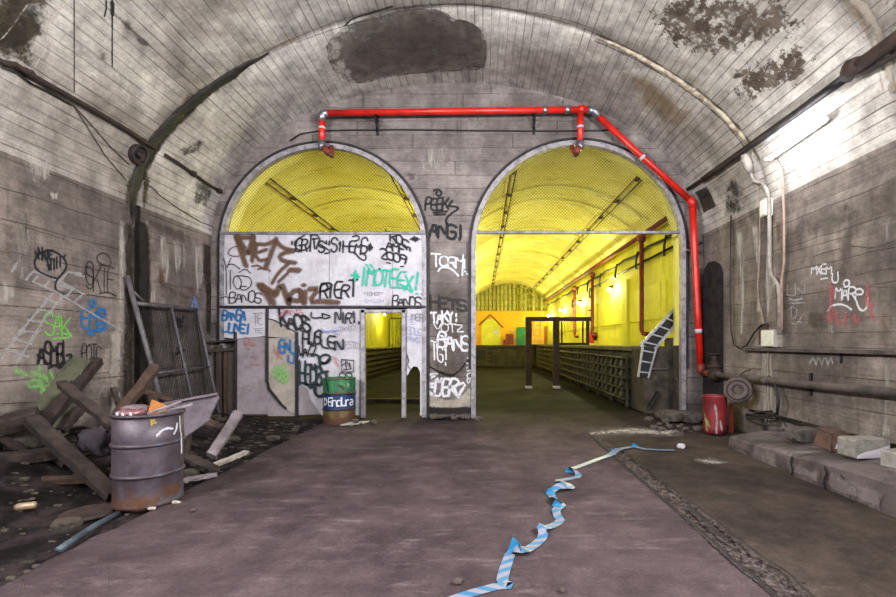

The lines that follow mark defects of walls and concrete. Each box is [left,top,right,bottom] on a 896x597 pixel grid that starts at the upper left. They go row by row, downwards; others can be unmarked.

water stain [0,0,69,64]
spalling [326,9,486,83]
peeling [639,0,819,111]